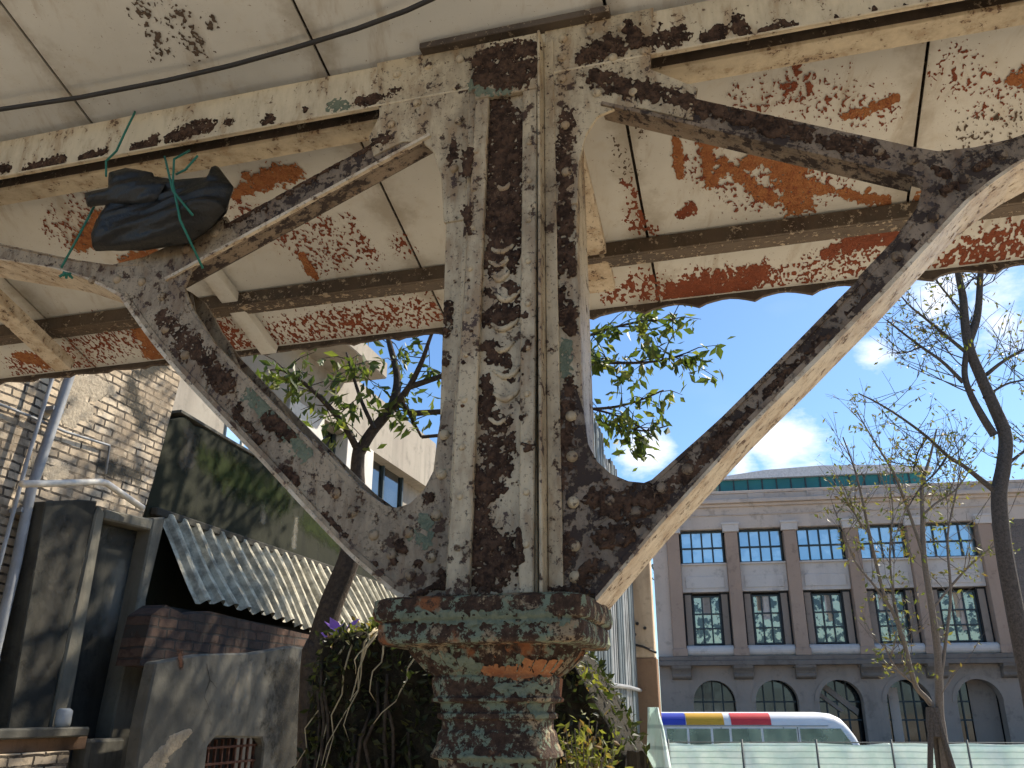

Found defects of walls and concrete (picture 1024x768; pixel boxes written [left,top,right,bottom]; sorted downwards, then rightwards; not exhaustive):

rust [575,9,891,161]
peeling [728,62,903,132]
peeling [927,39,1024,136]
rust [222,130,395,229]
peeling [620,177,659,236]
peeling [600,231,900,306]
peeling [670,136,892,224]
peeling [928,216,1024,269]
peeling [216,317,255,350]
peeling [481,654,564,681]